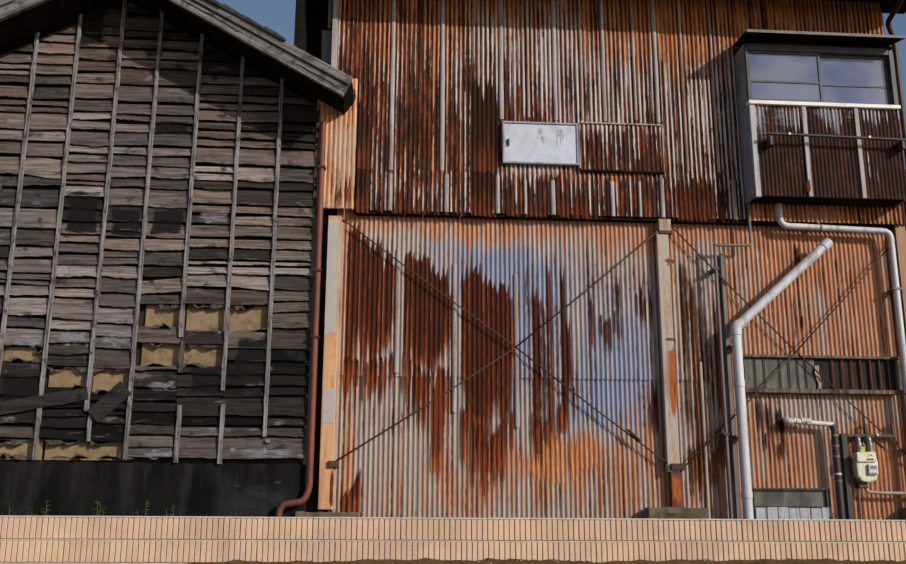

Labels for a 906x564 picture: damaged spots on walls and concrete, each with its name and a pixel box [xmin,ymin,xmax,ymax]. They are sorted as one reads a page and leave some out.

rust [584,130,601,168]
rust [508,191,602,219]
rust [669,178,739,222]
rust [337,34,575,504]
peeling [145,304,269,332]
peeling [2,343,224,394]
rust [667,257,726,498]
peeling [0,439,134,461]
rust [648,383,659,434]
rust [757,395,787,465]
rust [672,476,682,507]